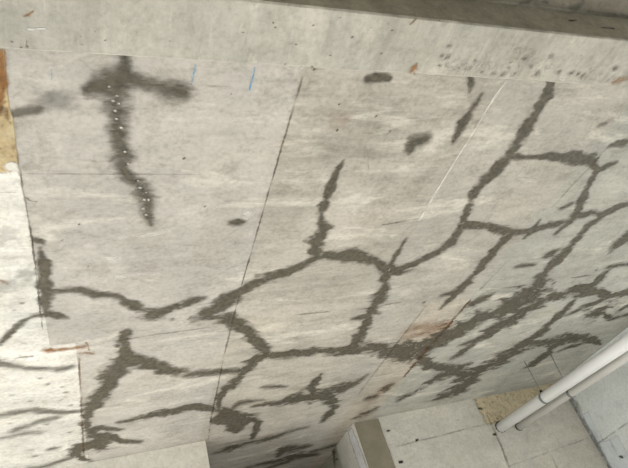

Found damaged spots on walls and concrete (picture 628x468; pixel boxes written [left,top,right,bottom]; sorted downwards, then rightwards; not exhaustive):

leakage [364,73,392,83]
leakage [116,81,628,453]
leakage [569,398,612,468]